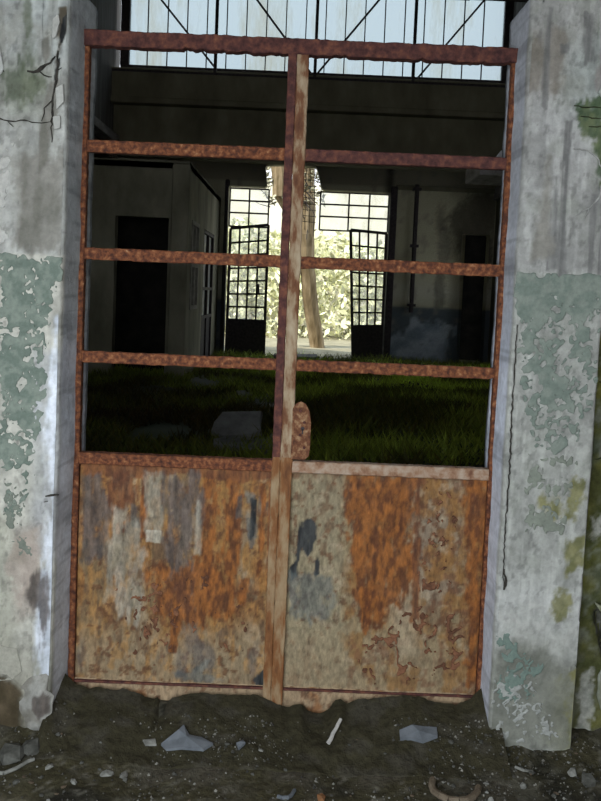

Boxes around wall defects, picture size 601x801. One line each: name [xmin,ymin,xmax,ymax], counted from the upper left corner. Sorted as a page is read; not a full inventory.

crack [0,50,61,142]
peeling [0,227,63,529]
peeling [513,271,601,535]
damp [593,409,601,462]
peeling [12,536,32,558]
corrosion [125,480,271,655]
corrosion [339,475,487,693]
damp [586,508,601,544]
flaking render [574,664,601,731]